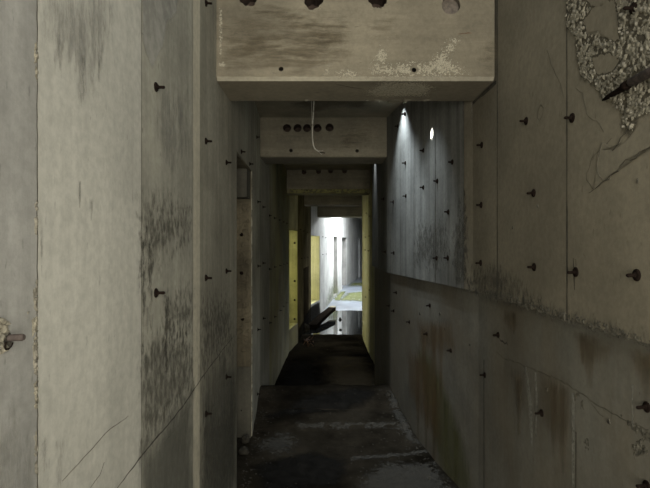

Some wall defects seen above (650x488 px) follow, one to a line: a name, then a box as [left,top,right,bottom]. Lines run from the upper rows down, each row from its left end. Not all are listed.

peeling [362,38,470,102]
spalling [565,0,650,192]
damp [142,203,182,312]
spalling [0,317,12,354]
damp [143,304,192,440]
crack [117,338,232,488]